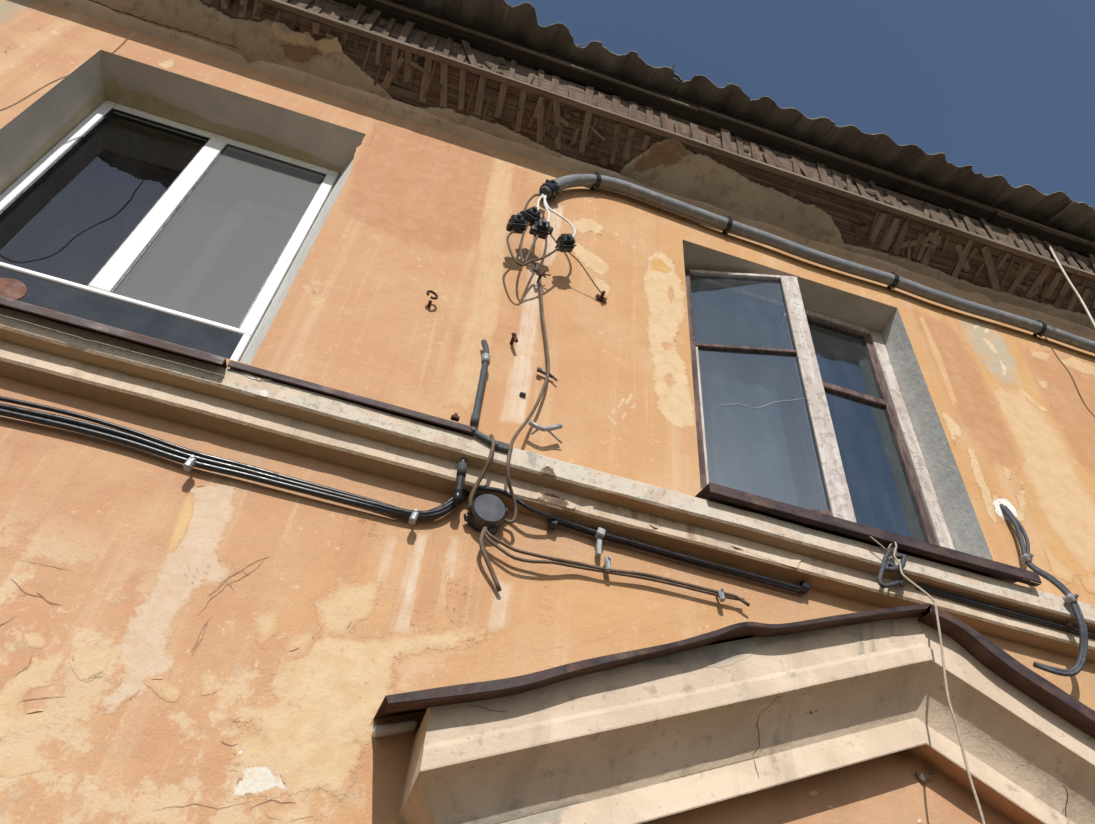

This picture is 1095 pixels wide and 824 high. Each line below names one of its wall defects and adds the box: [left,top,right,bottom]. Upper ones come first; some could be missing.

peeling [157,58,176,69]
flaking render [202,0,691,174]
peeling [642,251,696,429]
peeling [87,480,241,716]
crack [191,556,270,655]
peeling [0,653,68,740]
peeling [221,578,488,824]
crack [753,692,781,777]